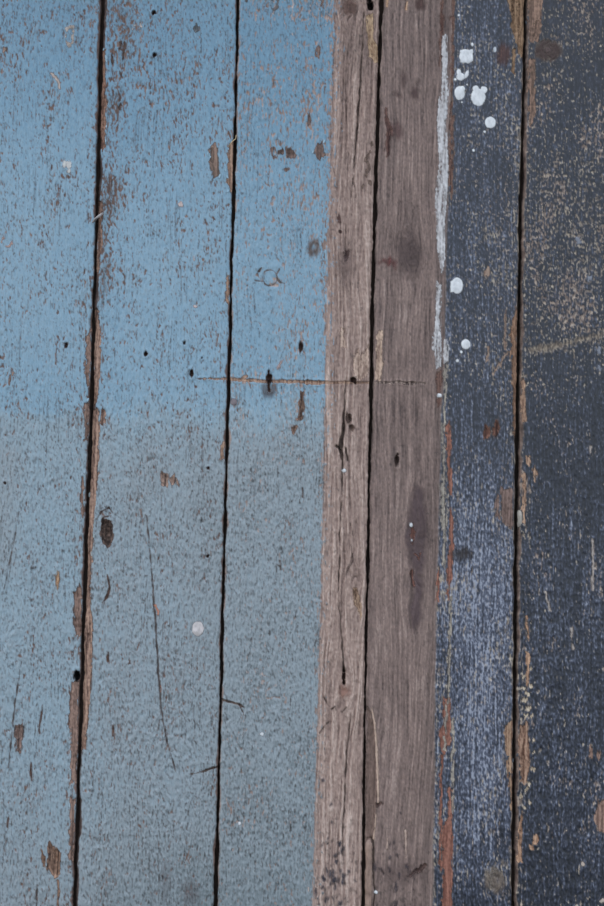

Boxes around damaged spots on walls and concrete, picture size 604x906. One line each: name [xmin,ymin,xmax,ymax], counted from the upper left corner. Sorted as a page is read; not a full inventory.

peeling [207,142,233,192]
peeling [486,308,527,437]
peeling [445,421,453,495]
peeling [67,309,114,784]
crack [335,389,353,672]
peeling [435,508,454,602]
spalling [14,724,24,753]
spalling [41,797,76,906]
peeling [438,697,454,906]